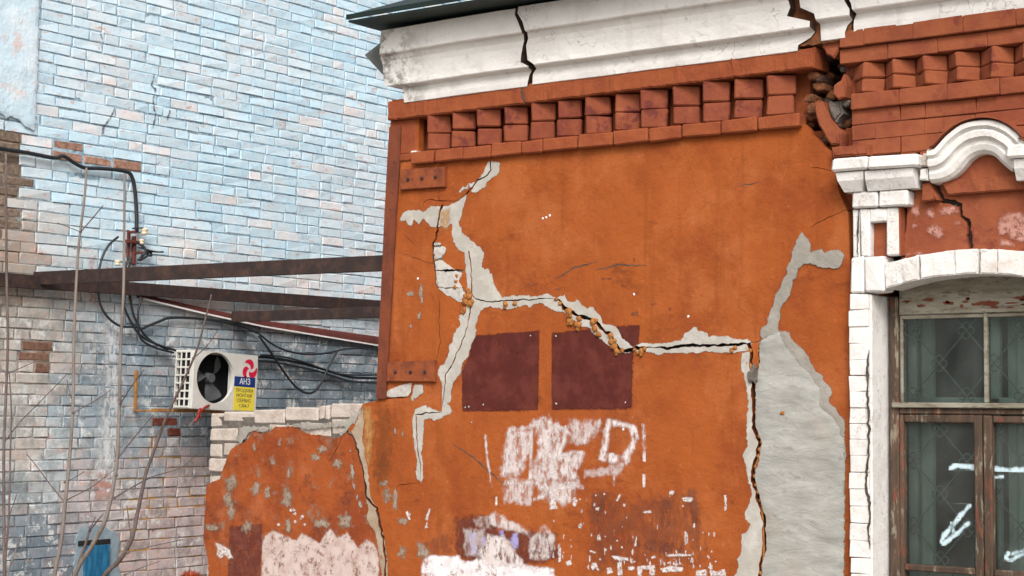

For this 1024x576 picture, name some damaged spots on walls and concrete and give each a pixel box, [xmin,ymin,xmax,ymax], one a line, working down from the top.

flaking render [0,131,34,232]
crack [906,186,973,248]
flaking render [432,242,466,302]
peeling [902,296,1024,308]
crack [387,160,766,576]
spalling [747,364,758,384]
peeling [223,474,252,532]
peeling [251,467,351,532]
crack [330,430,387,576]
peeling [216,543,233,558]
peeling [572,493,726,576]